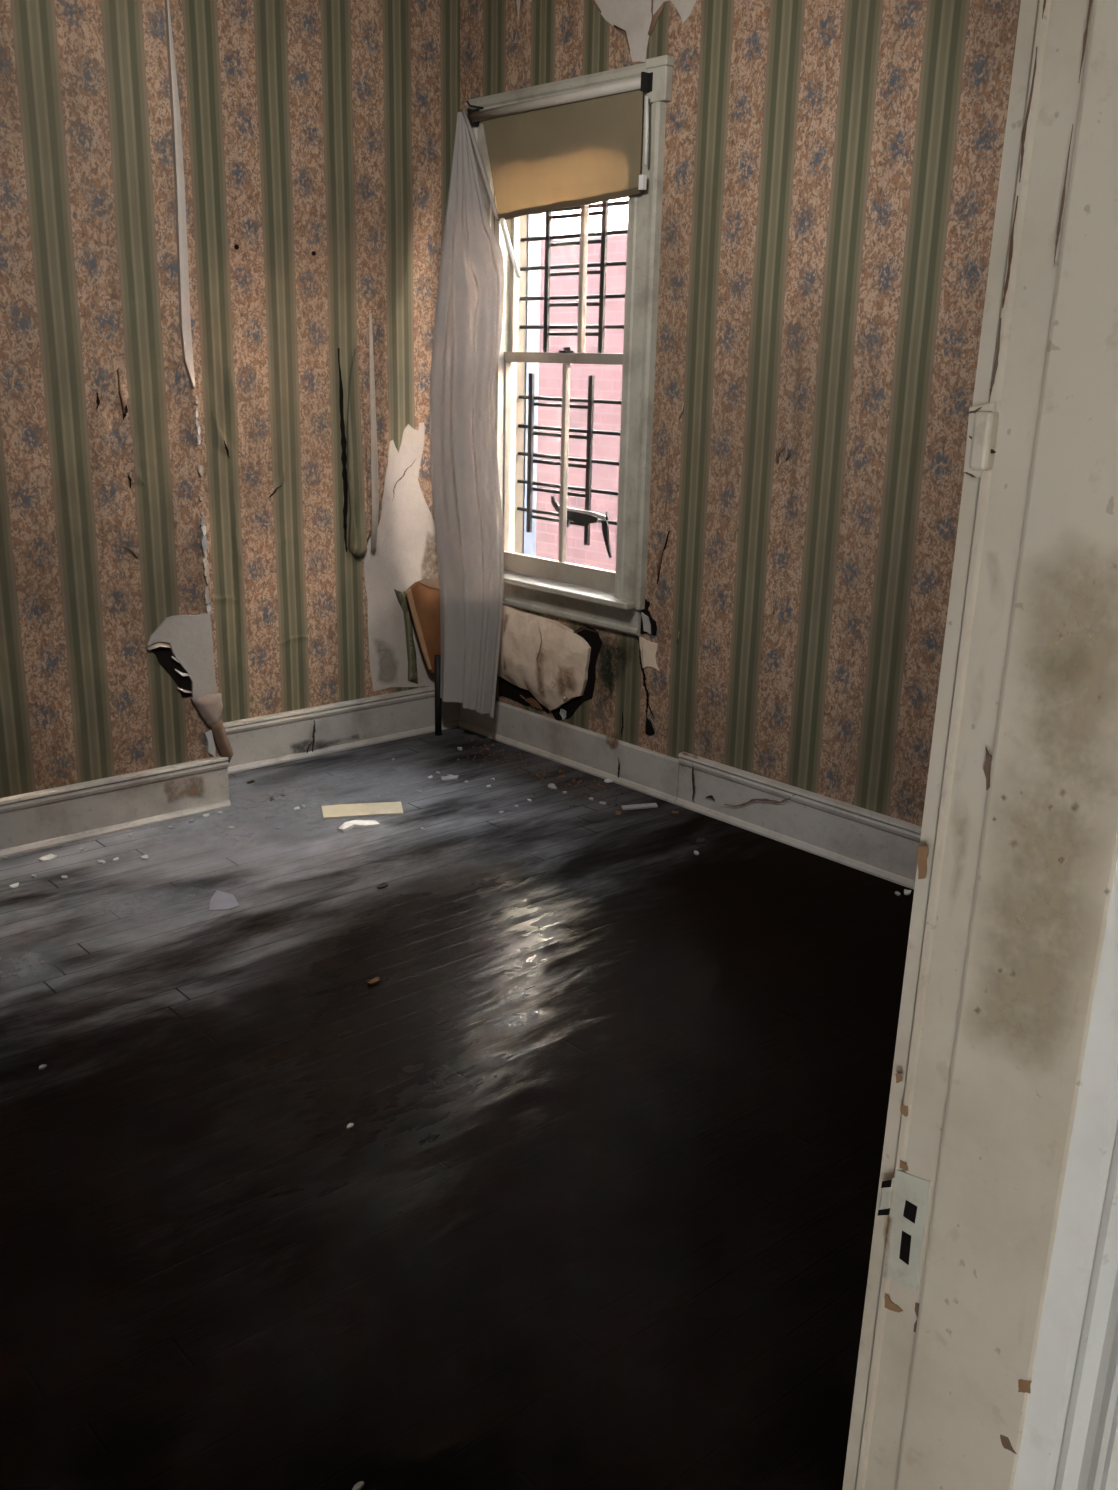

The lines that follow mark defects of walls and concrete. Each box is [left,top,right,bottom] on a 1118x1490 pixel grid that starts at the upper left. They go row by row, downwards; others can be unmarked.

flaking render [594,0,697,62]
flaking render [165,0,196,390]
flaking render [364,423,439,692]
flaking render [147,613,233,763]
crack [692,763,796,807]